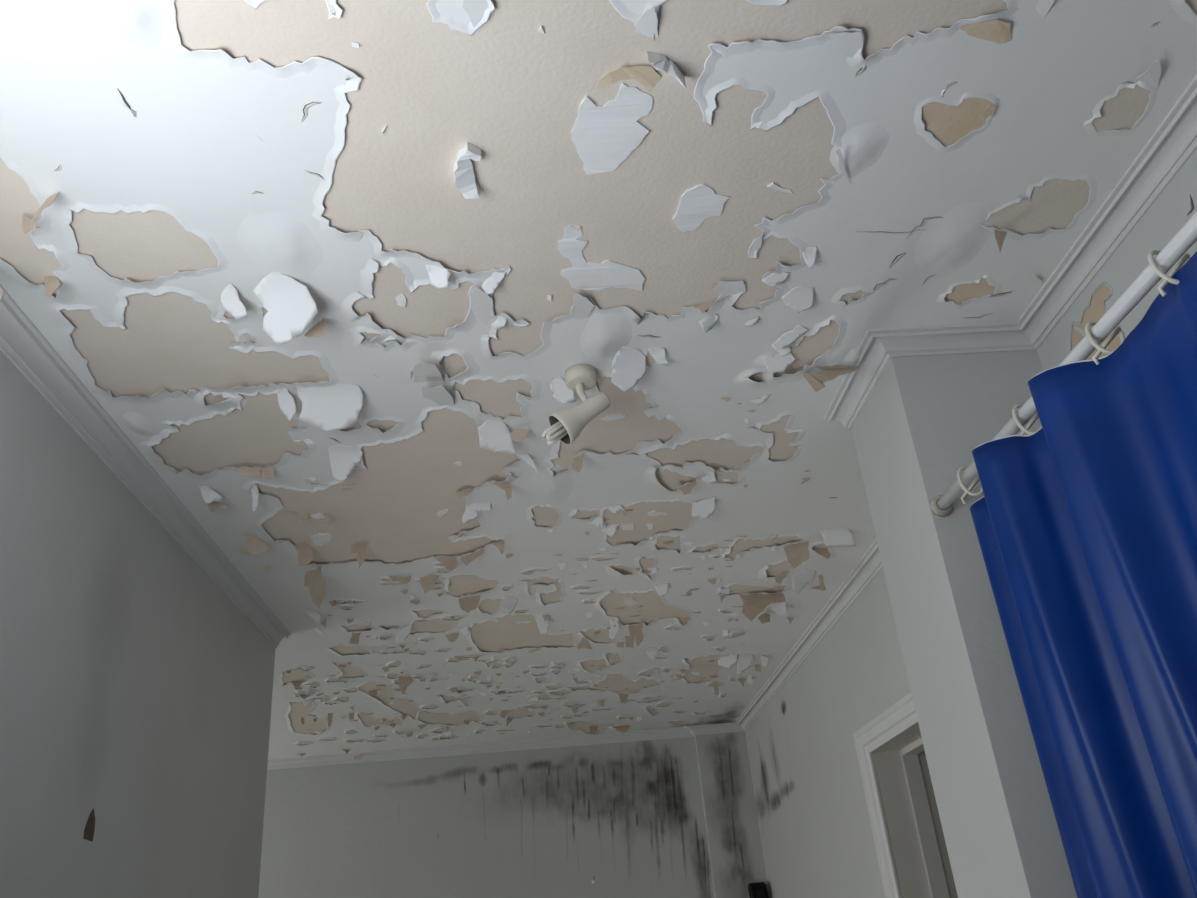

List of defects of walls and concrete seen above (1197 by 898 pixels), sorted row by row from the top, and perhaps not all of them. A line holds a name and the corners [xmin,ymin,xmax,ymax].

peeling [1169,0,1197,30]
peeling [1083,59,1161,138]
peeling [982,174,1098,253]
peeling [0,0,1019,760]
peeling [1070,281,1113,351]
peeling [1086,330,1120,360]